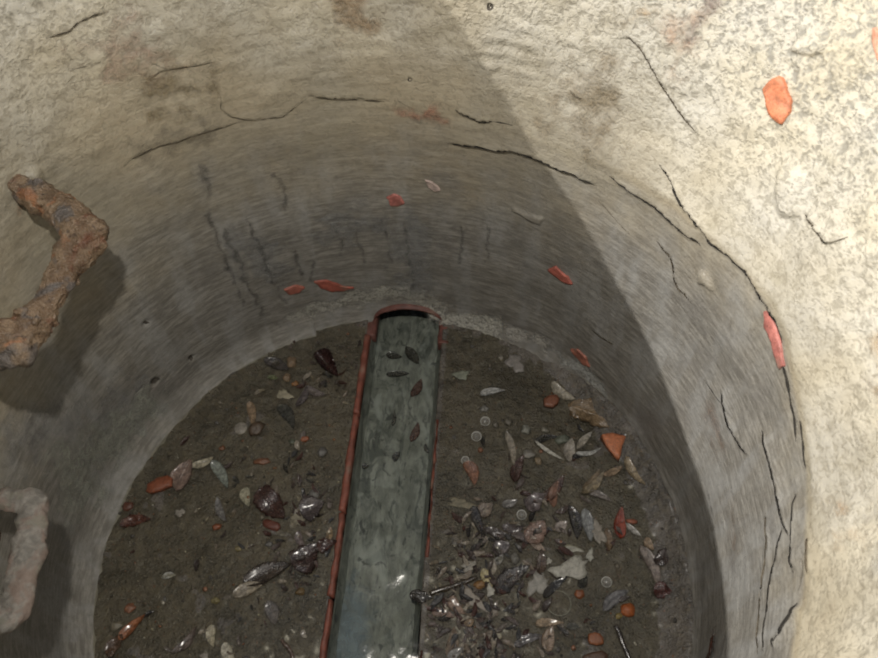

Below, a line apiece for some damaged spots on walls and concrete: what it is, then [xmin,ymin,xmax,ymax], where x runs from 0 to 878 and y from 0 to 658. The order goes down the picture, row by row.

crack [122,62,513,168]
crack [621,37,698,134]
crack [453,144,782,343]
crack [705,367,807,651]